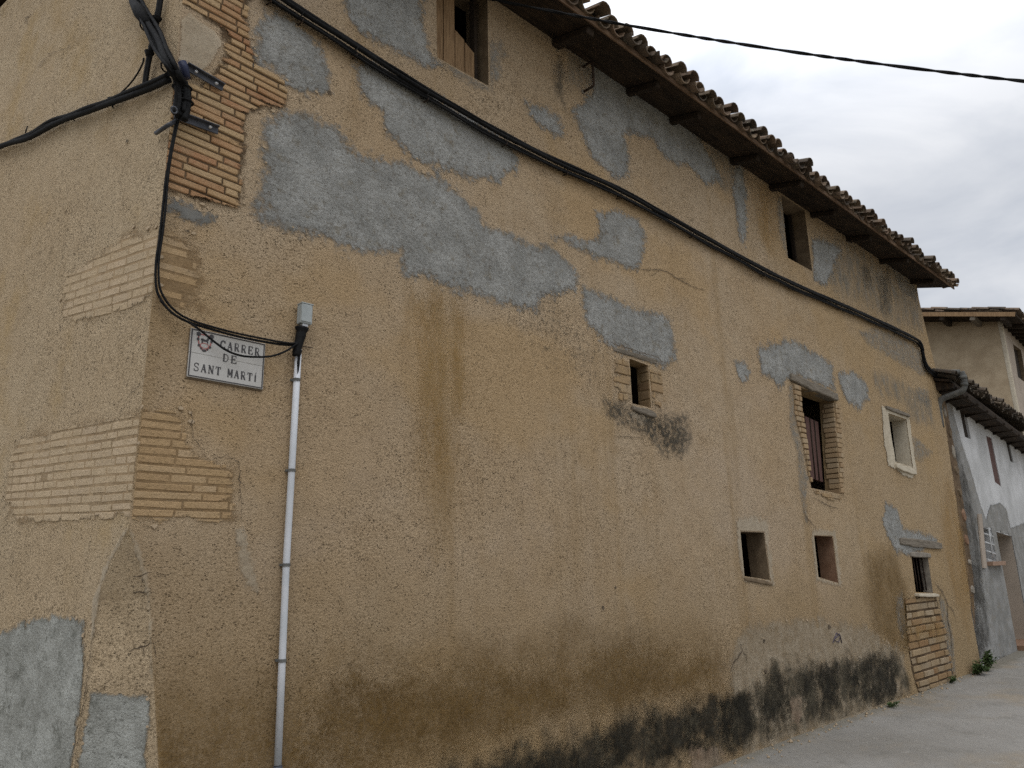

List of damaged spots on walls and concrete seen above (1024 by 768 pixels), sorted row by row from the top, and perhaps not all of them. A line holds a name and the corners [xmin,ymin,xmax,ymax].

peeling [59,0,677,369]
peeling [571,67,747,243]
flaking render [2,405,257,586]
peeling [735,339,870,497]
peeling [883,502,937,556]
peeling [0,614,150,768]
damp [158,555,910,768]
peeling [732,597,955,756]